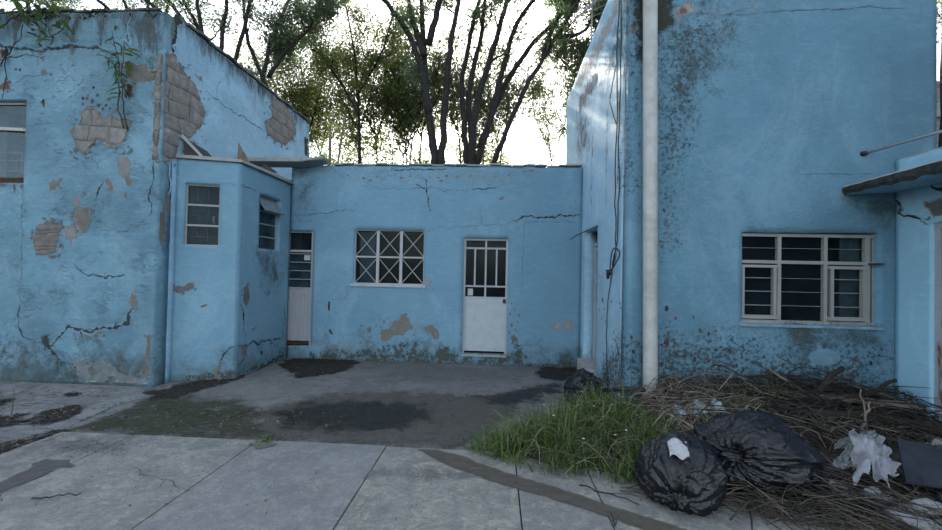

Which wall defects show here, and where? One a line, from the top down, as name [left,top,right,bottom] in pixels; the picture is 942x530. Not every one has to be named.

leakage [575,0,643,87]
crack [696,5,898,16]
spalling [68,51,209,199]
spalling [263,94,297,150]
leakage [658,0,731,254]
spalling [29,191,94,259]
crack [373,166,582,295]
crack [896,197,929,225]
crack [930,183,942,192]
crack [15,188,135,374]
peeling [329,313,442,348]
leakage [658,322,927,412]